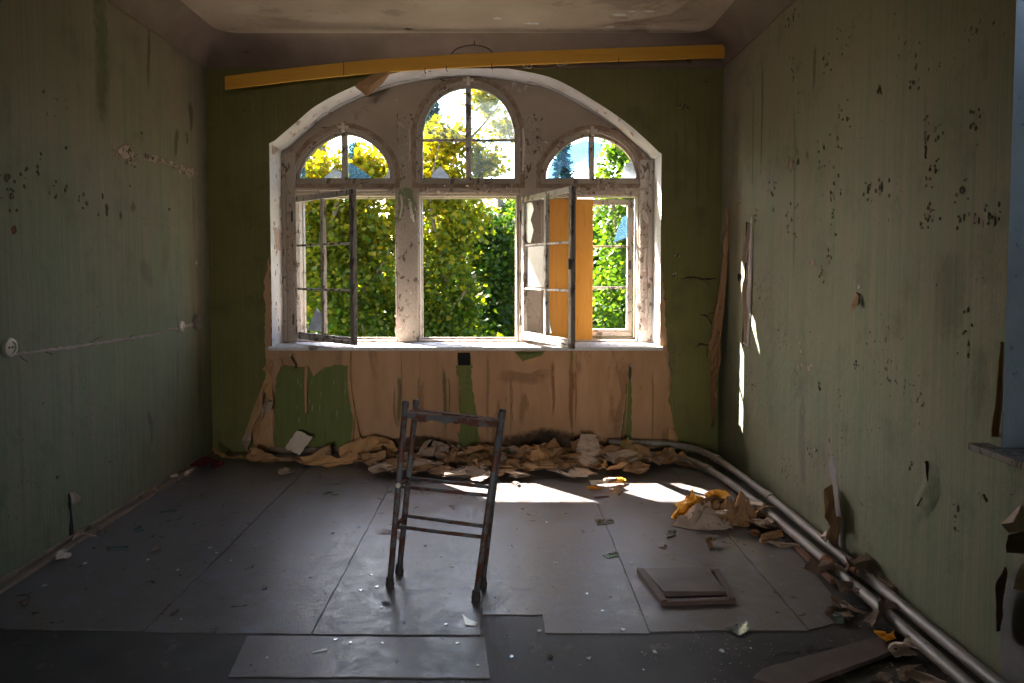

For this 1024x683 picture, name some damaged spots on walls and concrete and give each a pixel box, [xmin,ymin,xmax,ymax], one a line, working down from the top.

peeling [242,359,273,453]
spalling [456,353,473,368]
peeling [515,351,545,365]
peeling [709,209,757,428]
peeling [995,505,1024,683]